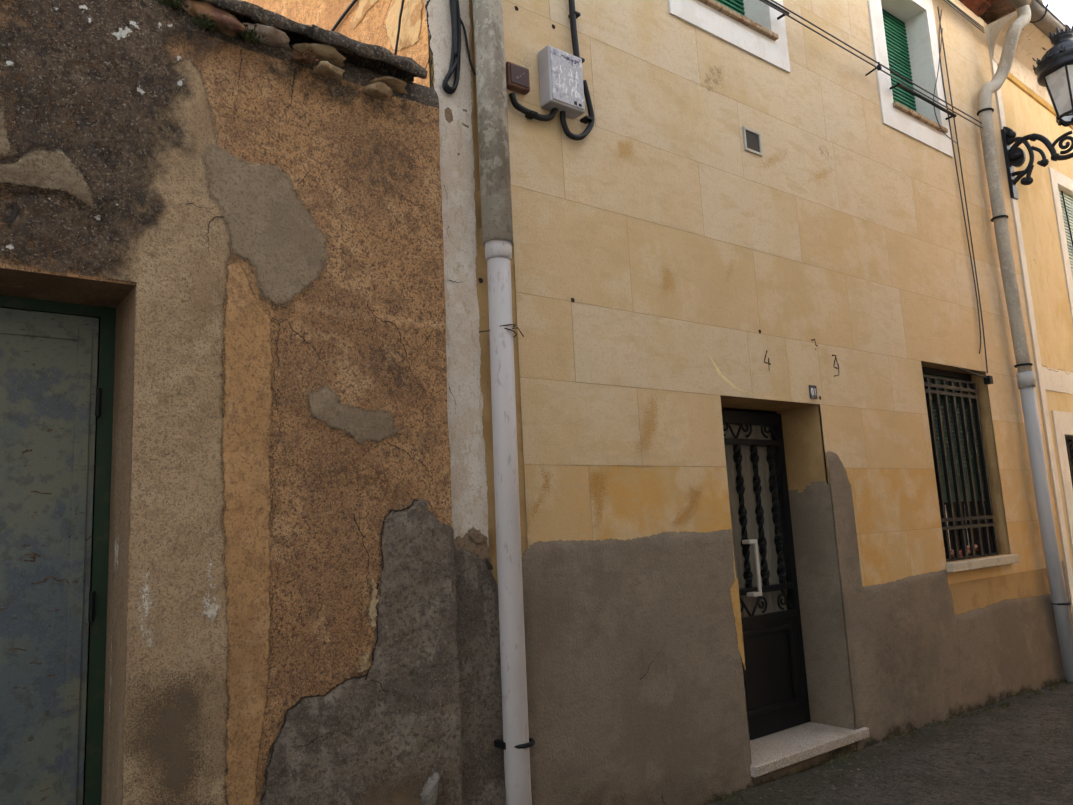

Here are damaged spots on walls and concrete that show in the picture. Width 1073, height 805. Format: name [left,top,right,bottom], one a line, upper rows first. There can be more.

spalling [349,0,378,30]
spalling [386,0,423,51]
spalling [260,498,506,805]